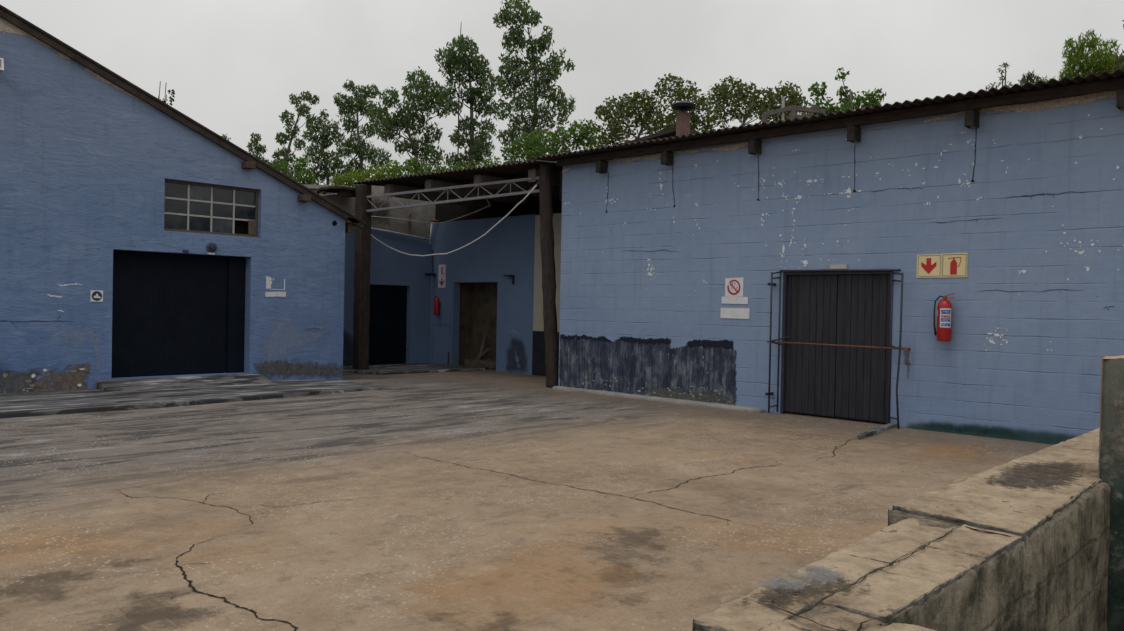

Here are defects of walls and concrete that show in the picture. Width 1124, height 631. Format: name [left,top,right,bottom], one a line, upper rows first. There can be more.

peeling [0,17,71,63]
peeling [753,167,861,268]
crack [928,191,1089,223]
flaking render [0,364,94,393]
water stain [909,423,1075,445]
water stain [986,461,1087,490]
crack [834,521,1012,591]
crack [171,537,298,631]
crack [752,592,874,631]